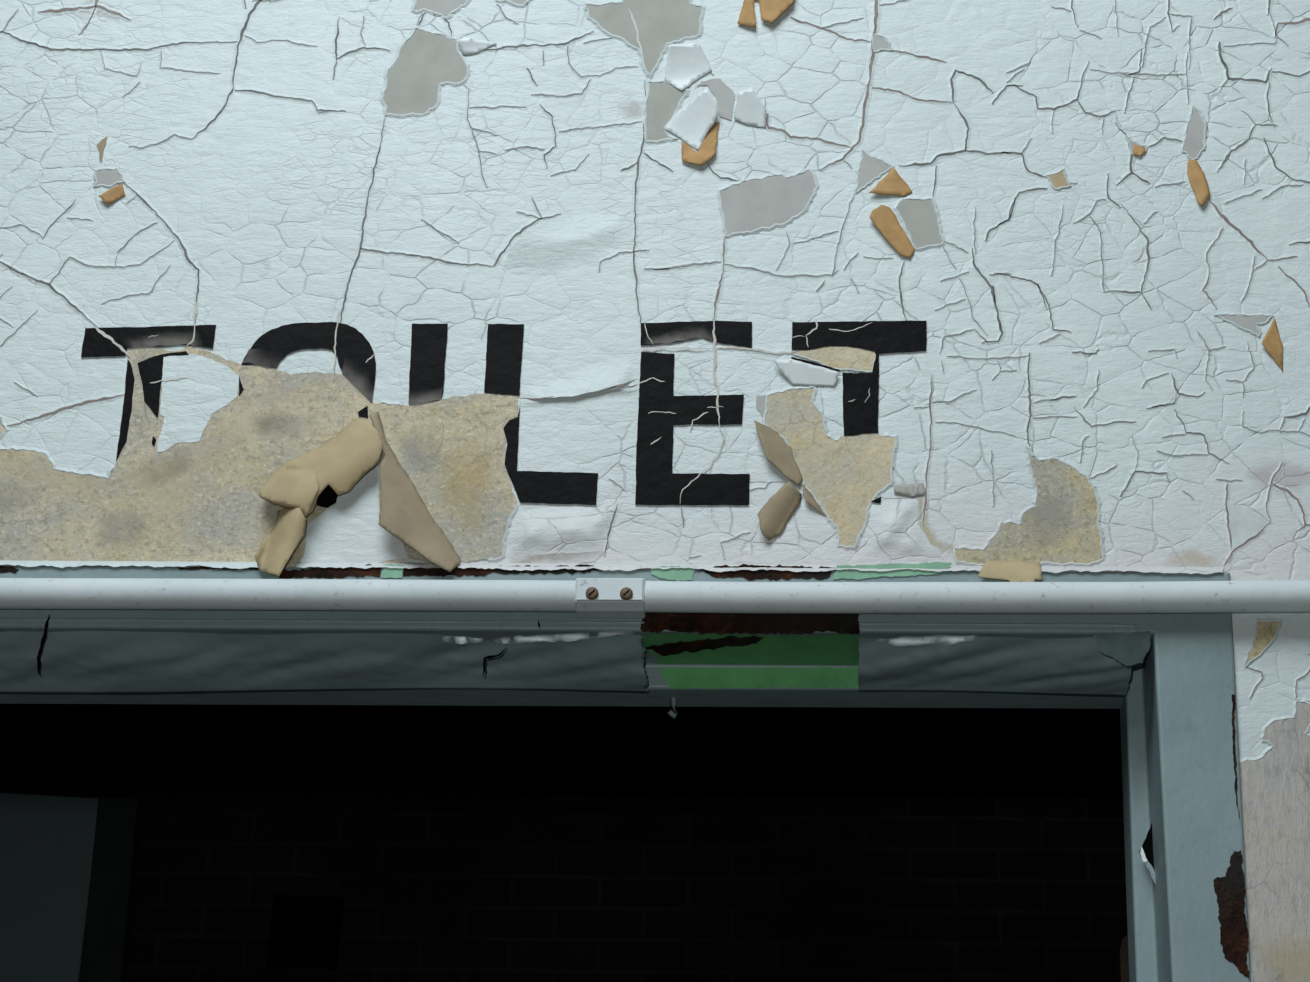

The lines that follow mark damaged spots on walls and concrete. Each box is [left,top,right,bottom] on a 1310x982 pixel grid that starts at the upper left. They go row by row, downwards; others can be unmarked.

crack [0,0,391,151]
peeling [379,0,497,119]
peeling [583,0,766,166]
crack [0,181,202,428]
peeling [716,167,820,238]
crack [332,0,1310,566]
peeling [854,148,946,259]
peeling [0,346,519,578]
peeling [754,346,1107,582]
peeling [641,634,859,689]
corrosion [1213,850,1250,980]
peeling [1240,698,1310,982]